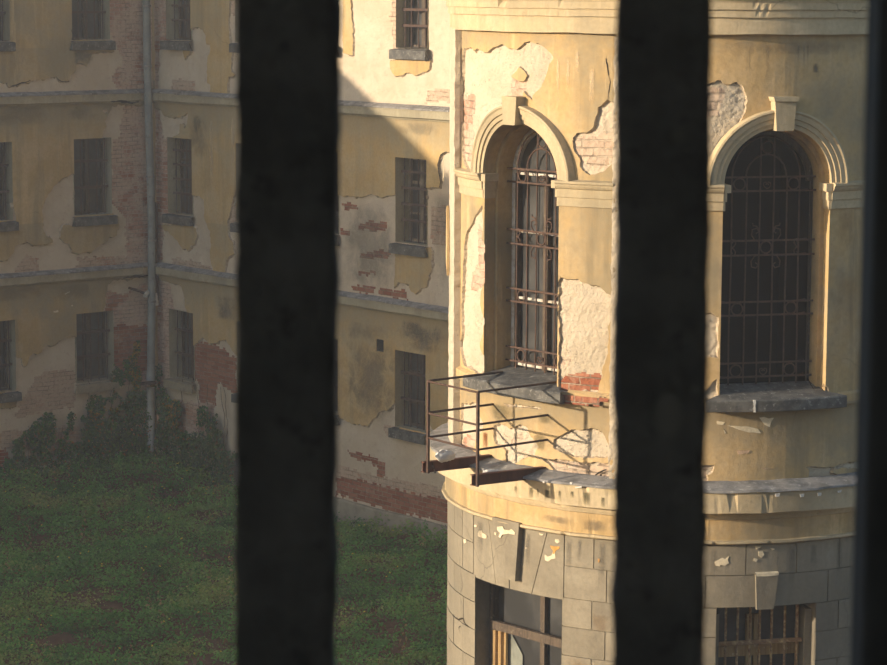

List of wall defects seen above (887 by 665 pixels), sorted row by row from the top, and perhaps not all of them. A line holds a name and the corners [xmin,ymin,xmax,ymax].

peeling [0,0,210,93]
peeling [227,0,237,94]
peeling [0,103,213,274]
peeling [225,190,237,274]
peeling [337,0,553,307]
peeling [460,37,617,488]
peeling [710,80,747,154]
peeling [0,276,238,488]
peeling [335,403,448,526]
spalling [754,546,779,576]